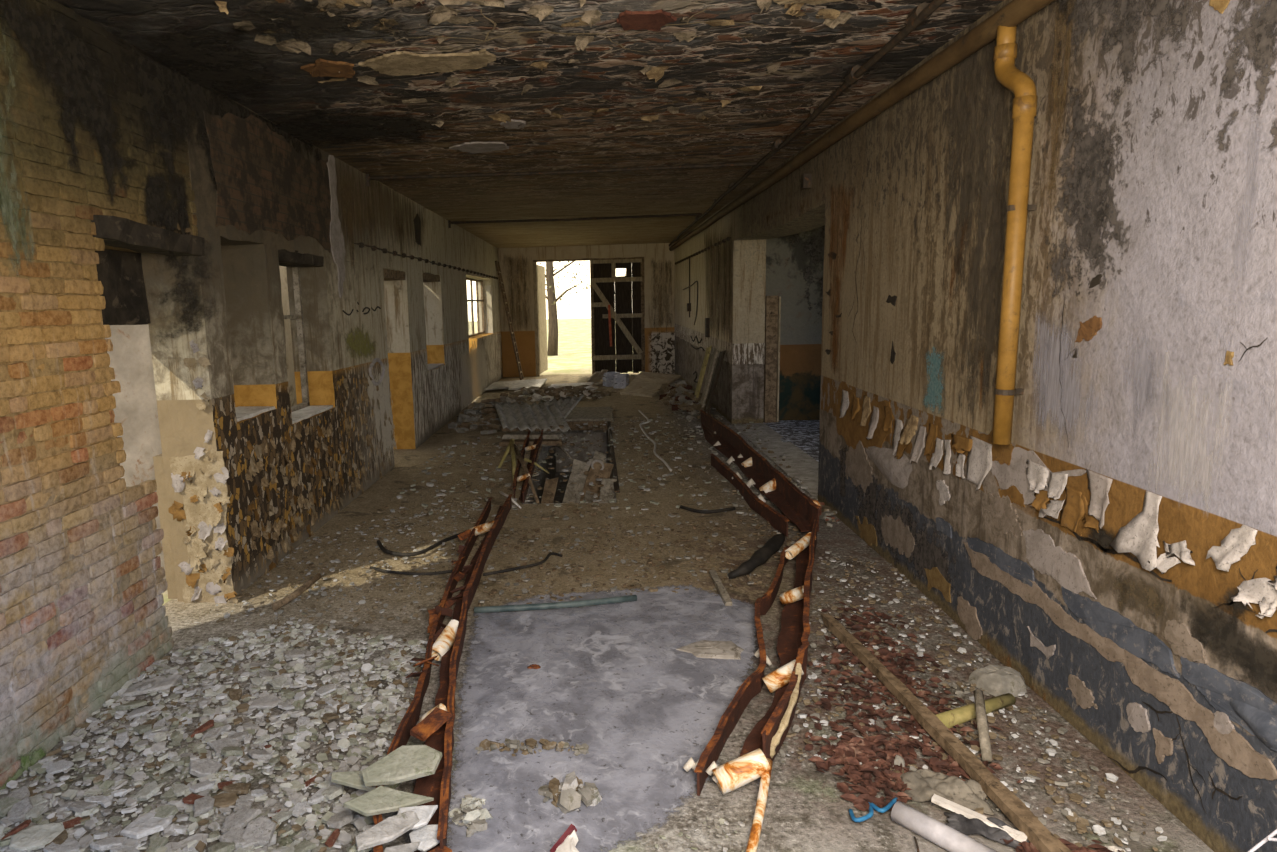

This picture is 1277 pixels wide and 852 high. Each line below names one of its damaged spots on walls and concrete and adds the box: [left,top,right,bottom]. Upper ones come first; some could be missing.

peeling [215,0,505,105]
peeling [449,63,781,153]
peeling [526,0,754,70]
peeling [757,0,852,29]
leakage [1047,0,1191,300]
leakage [1211,0,1277,180]
leakage [944,42,1014,420]
spalling [168,430,238,604]
peeling [246,422,350,575]
spalling [836,381,1277,781]
leakage [1113,576,1165,635]
leakage [1180,590,1277,702]